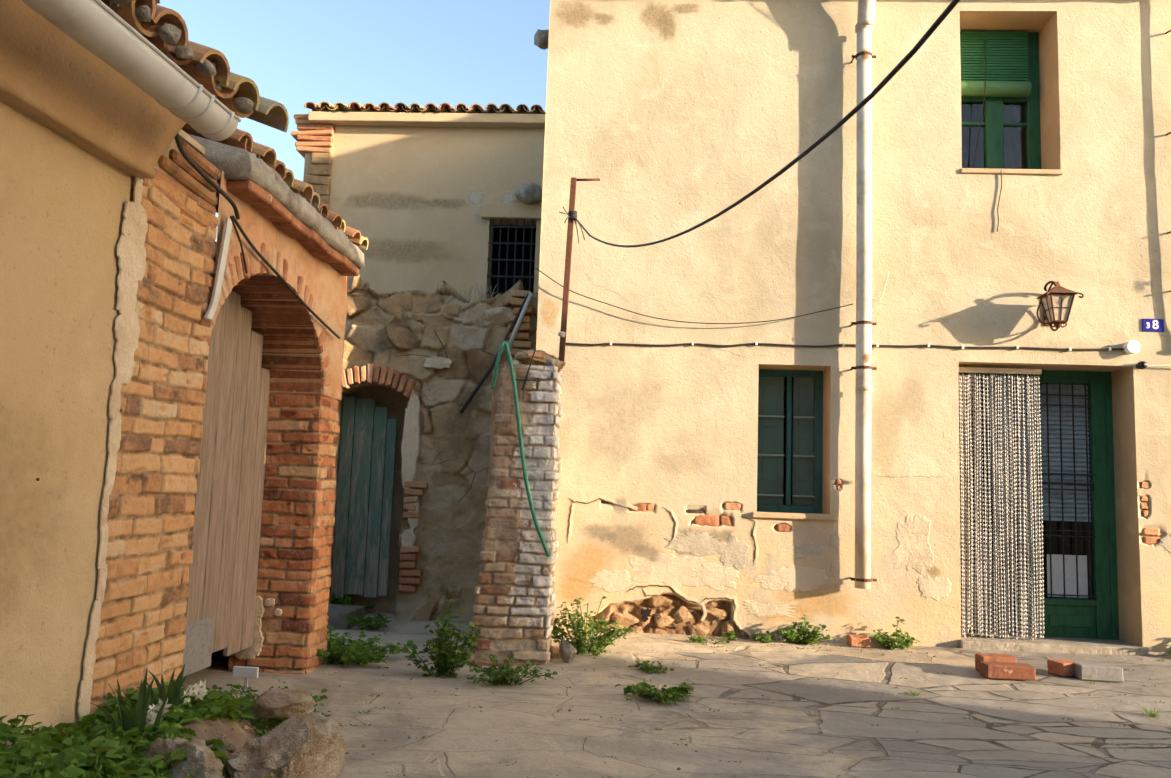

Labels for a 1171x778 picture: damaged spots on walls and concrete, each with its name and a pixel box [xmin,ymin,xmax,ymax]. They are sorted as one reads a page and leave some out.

crack [566,494,679,547]
flaking render [587,502,750,593]
crack [740,513,759,568]
spalling [774,524,791,532]
spalling [1137,481,1171,554]
flaking render [743,565,828,618]